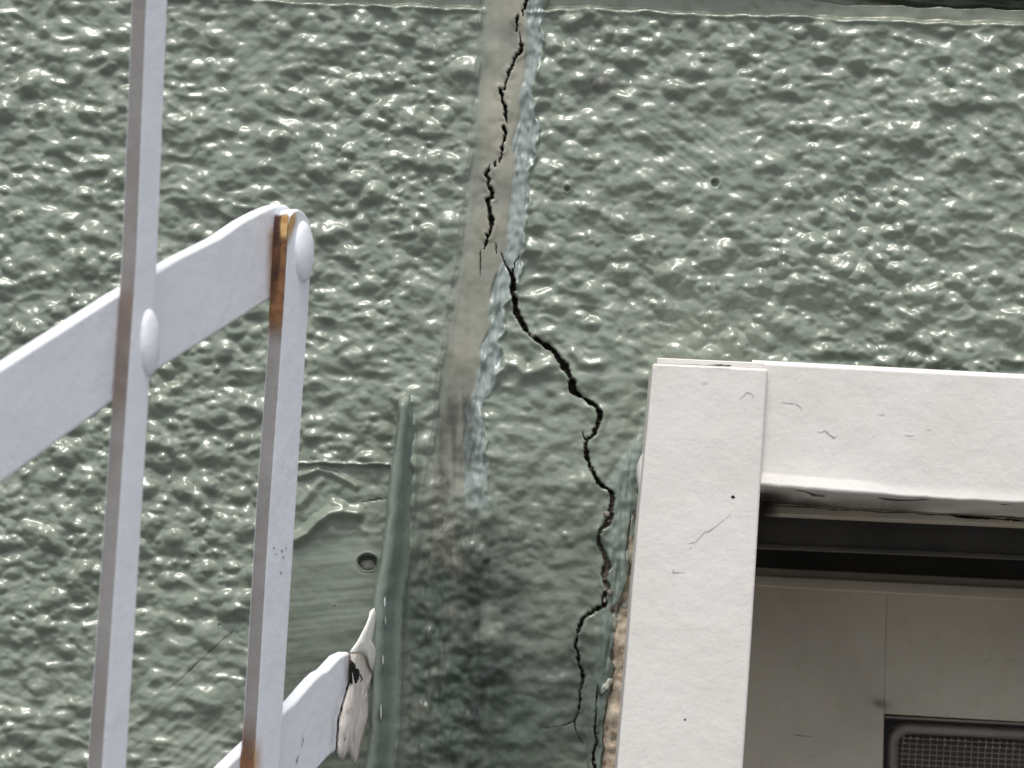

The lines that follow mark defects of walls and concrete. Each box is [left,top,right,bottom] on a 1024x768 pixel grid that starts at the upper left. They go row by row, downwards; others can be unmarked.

corrosion [268,213,296,329]
crack [480,0,615,768]
peeling [337,608,376,766]
peeling [599,512,636,768]